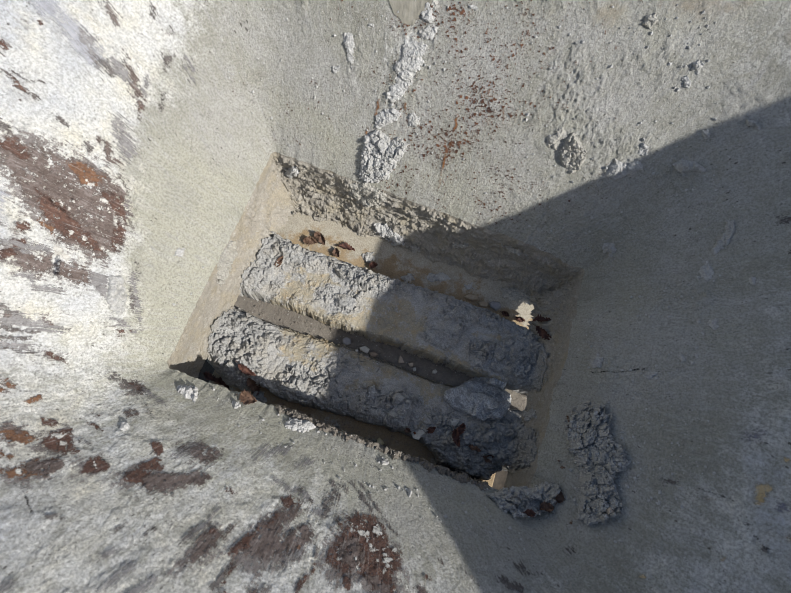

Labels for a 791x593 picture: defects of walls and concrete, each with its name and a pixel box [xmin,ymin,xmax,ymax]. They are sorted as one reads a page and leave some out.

corrosion [348,0,592,233]
corrosion [0,125,136,268]
corrosion [0,417,214,499]
peeling [169,438,225,471]
corrosion [313,493,432,593]